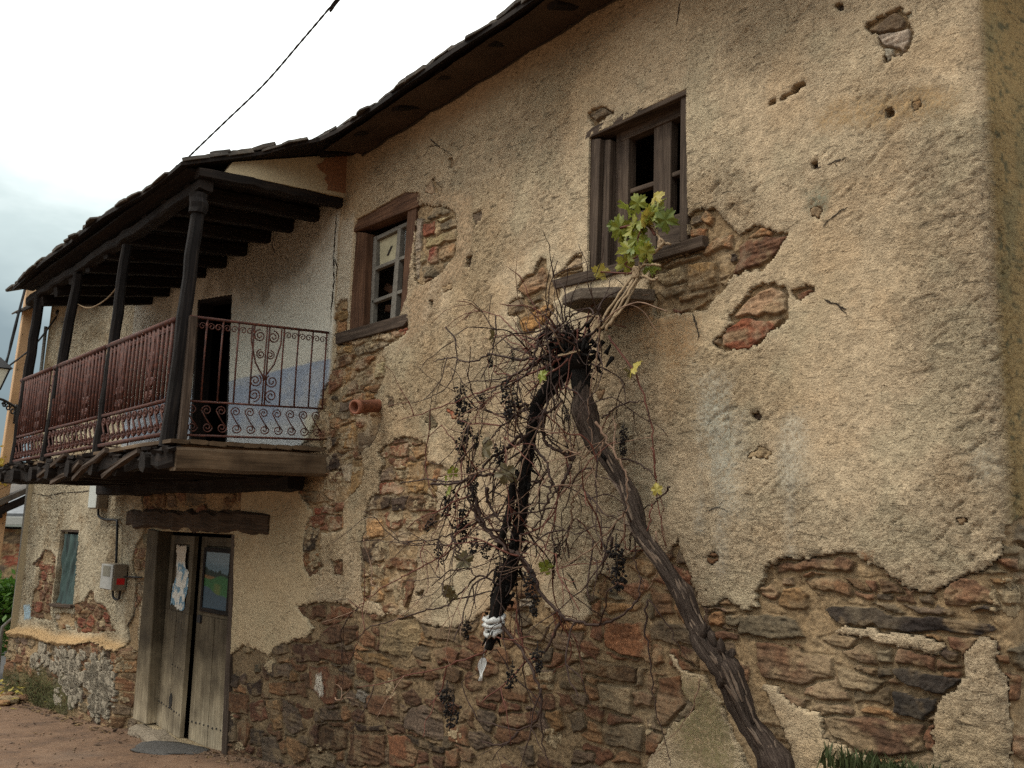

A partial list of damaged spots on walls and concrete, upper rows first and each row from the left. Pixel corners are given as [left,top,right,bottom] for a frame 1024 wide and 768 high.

spalling [868,8,914,62]
crack [330,221,338,310]
spalling [415,177,458,293]
spalling [508,253,583,336]
spalling [650,209,815,352]
spalling [228,300,757,768]
spalling [3,528,150,729]
spalling [666,517,1024,768]